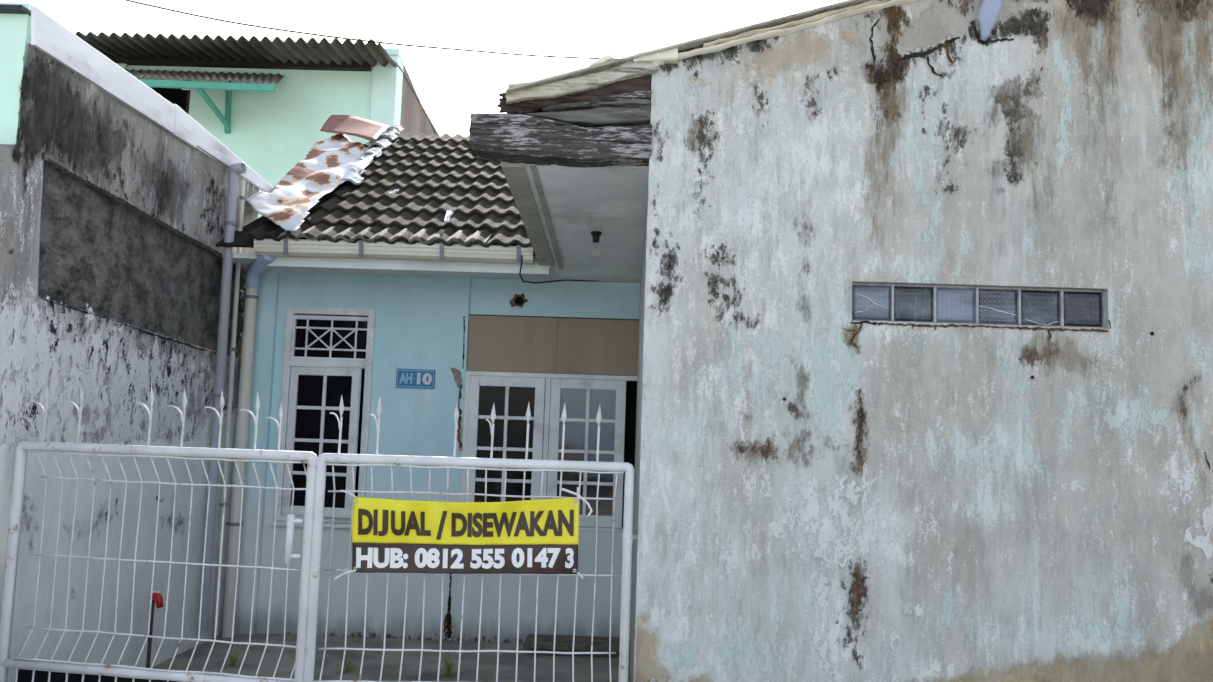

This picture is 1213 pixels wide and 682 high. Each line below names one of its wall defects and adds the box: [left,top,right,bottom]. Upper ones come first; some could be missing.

crack [869,19,966,79]
mould [13,58,190,218]
mould [201,172,226,234]
damp [648,184,686,315]
mould [687,108,718,218]
damp [704,239,759,328]
damp [919,68,1048,208]
damp [788,361,809,418]
peeling [1172,472,1213,560]
damp [635,619,669,682]
damp [834,559,869,670]
damp [935,557,1213,682]